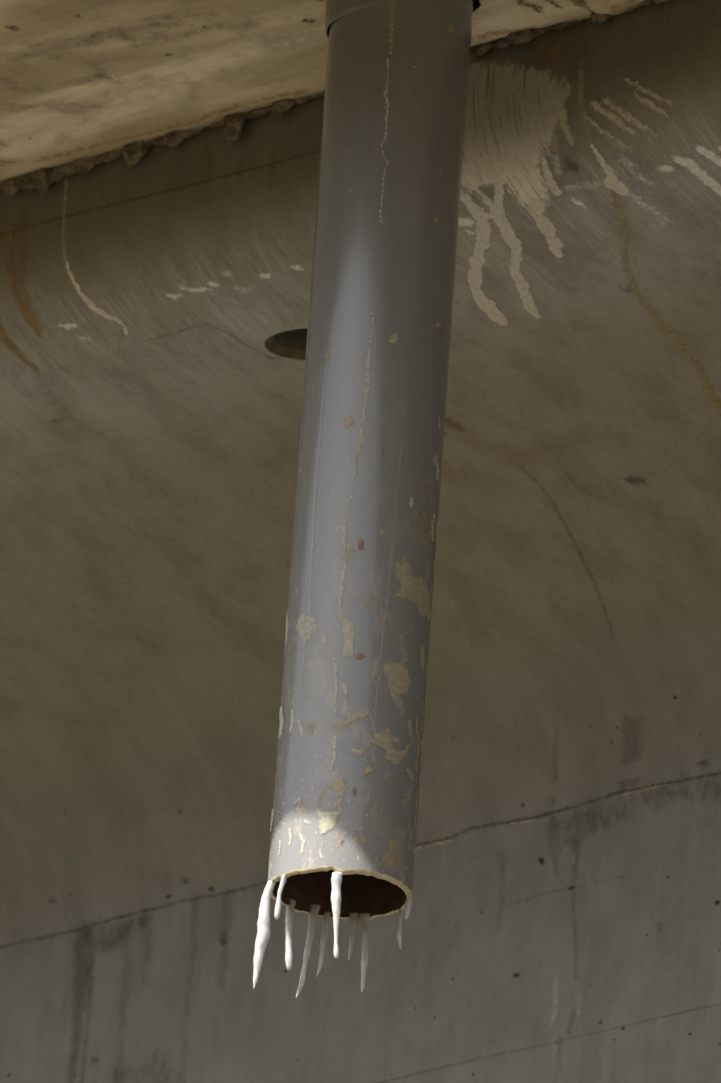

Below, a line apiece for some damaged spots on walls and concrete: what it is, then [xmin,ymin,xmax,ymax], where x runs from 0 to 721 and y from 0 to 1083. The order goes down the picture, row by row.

water stain [62,229,129,365]
water stain [580,63,721,413]